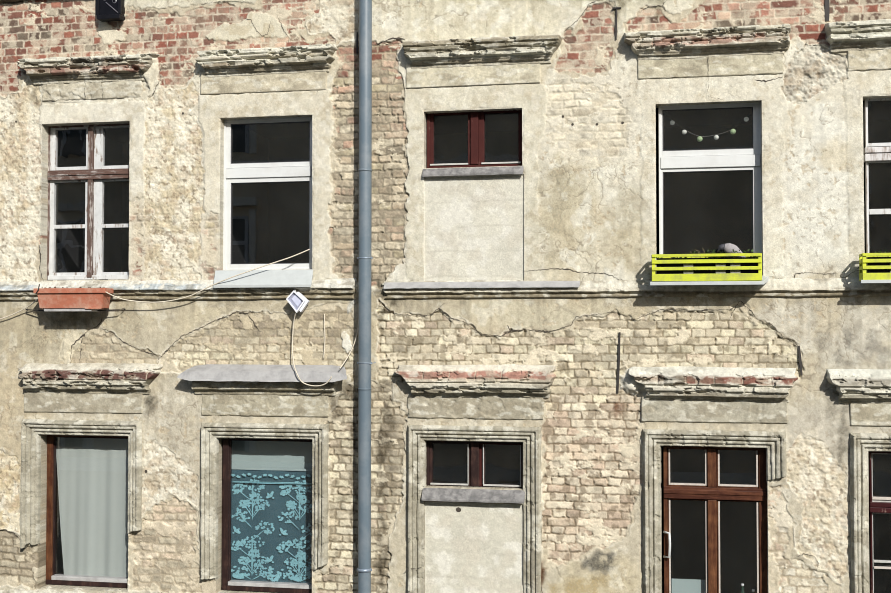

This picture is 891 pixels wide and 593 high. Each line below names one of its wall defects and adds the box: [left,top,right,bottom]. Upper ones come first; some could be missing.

flaking render [0,0,359,284]
flaking render [371,39,410,290]
flaking render [545,0,891,165]
crack [70,310,261,364]
flaking render [71,302,358,593]
flaking render [371,301,805,593]